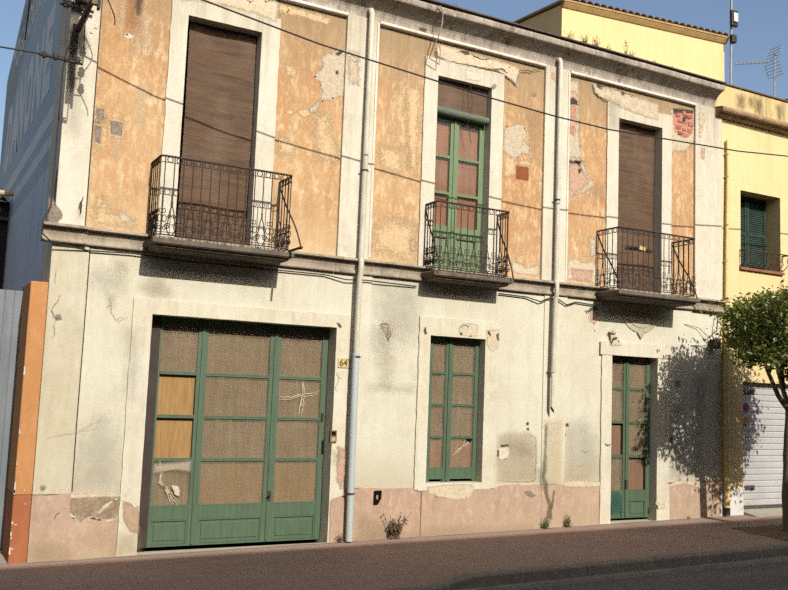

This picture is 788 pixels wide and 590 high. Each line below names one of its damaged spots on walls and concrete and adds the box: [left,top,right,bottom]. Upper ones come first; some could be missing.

flaking render [437,45,543,85]
peeling [287,49,345,163]
flaking render [593,82,658,119]
peeling [502,124,531,181]
flaking render [569,80,595,196]
crack [51,277,61,336]
spalling [459,323,500,351]
flaking render [586,307,601,331]
flaking render [497,445,509,460]
peeling [427,484,474,500]
flaking render [65,493,139,533]